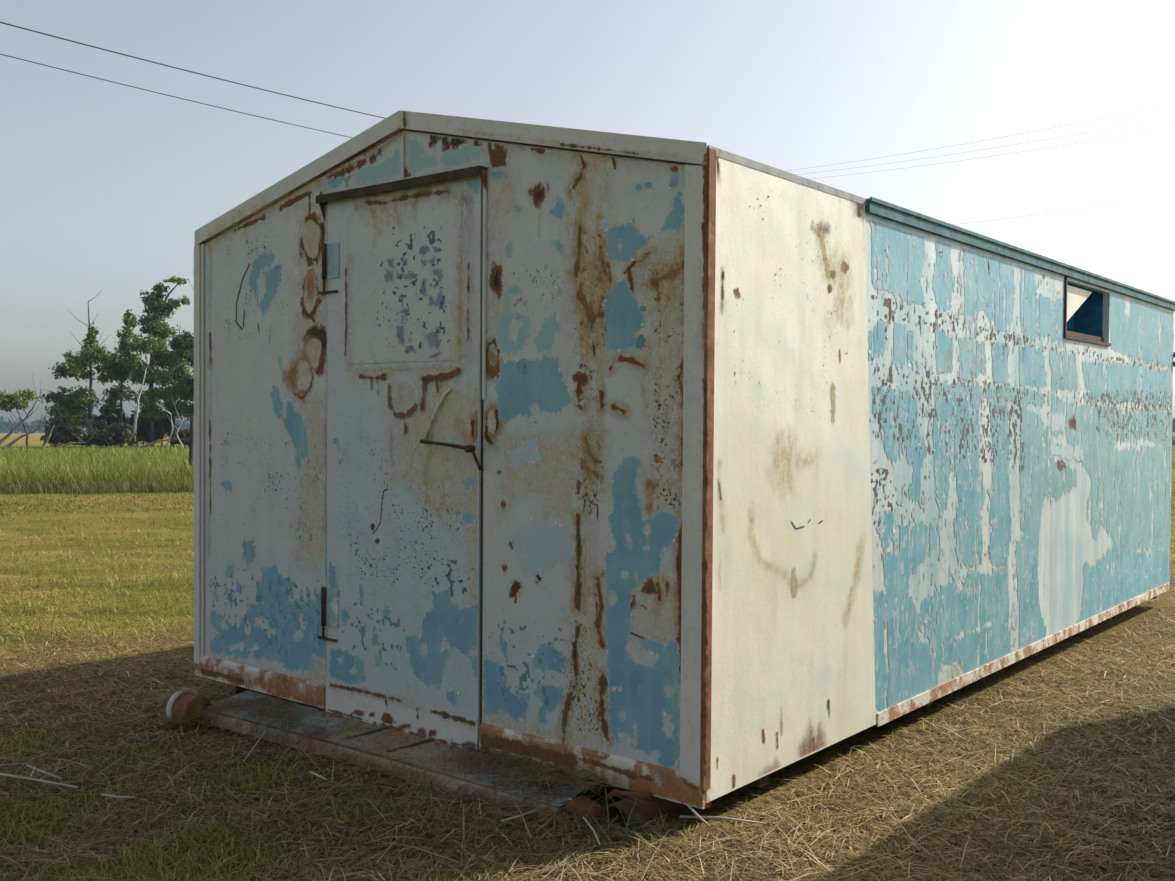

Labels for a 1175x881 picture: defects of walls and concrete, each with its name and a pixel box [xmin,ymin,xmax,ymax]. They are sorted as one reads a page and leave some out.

corrosion [279,111,406,399]
peeling [329,136,482,190]
corrosion [560,143,684,356]
corrosion [701,154,719,351]
corrosion [418,367,460,412]
peeling [209,168,685,769]
corrosion [199,558,718,805]
corrosion [573,372,588,410]
corrosion [573,433,605,648]
corrosion [630,523,682,677]
corrosion [703,379,722,532]
peeling [869,219,1174,711]